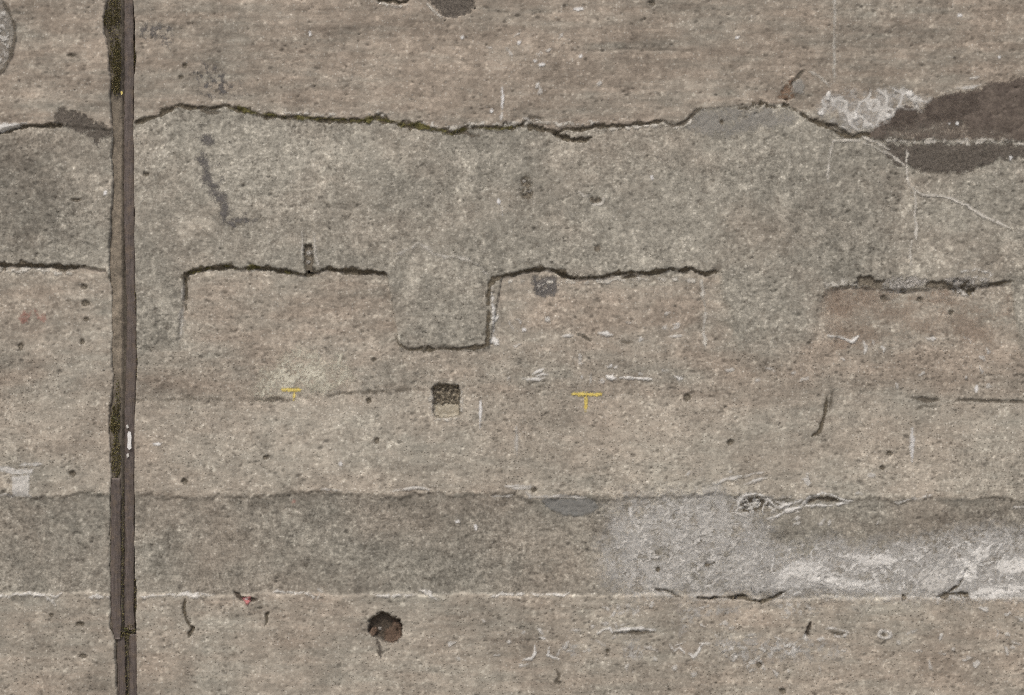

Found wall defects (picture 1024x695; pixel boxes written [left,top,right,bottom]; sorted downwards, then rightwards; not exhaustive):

crack [0,123,62,134]
crack [136,103,701,143]
damp [818,77,1024,173]
crack [0,260,86,275]
crack [178,244,719,352]
crack [656,589,784,604]